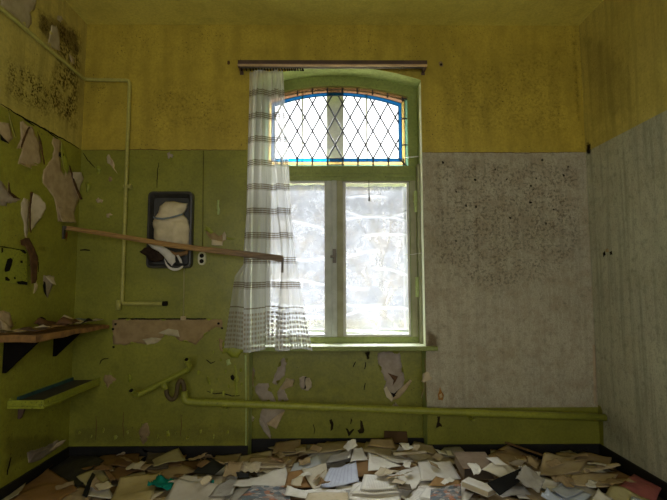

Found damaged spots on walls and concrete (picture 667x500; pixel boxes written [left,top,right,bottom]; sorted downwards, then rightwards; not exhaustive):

leakage [11,29,78,117]
peeling [0,112,84,223]
peeling [0,181,56,298]
flaking render [112,318,223,348]
peeling [220,355,312,446]
peeling [378,351,412,406]